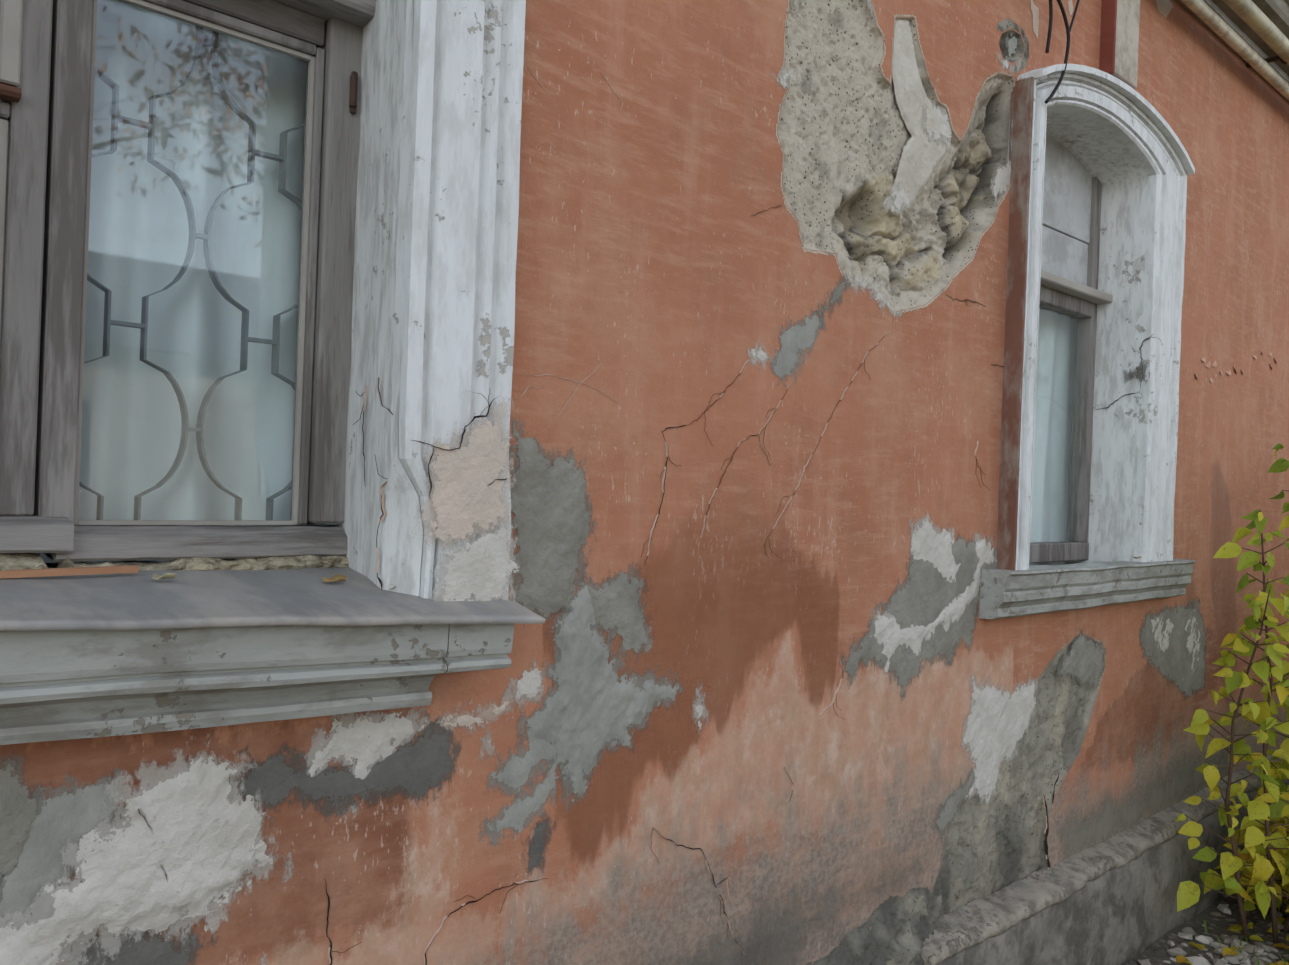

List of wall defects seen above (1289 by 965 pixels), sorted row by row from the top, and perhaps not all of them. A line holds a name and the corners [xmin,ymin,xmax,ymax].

spalling [776,0,1039,318]
crack [353,378,501,590]
spalling [415,400,520,602]
crack [641,360,790,562]
crack [765,332,890,558]
spalling [931,630,1106,915]
crack [650,827,747,959]